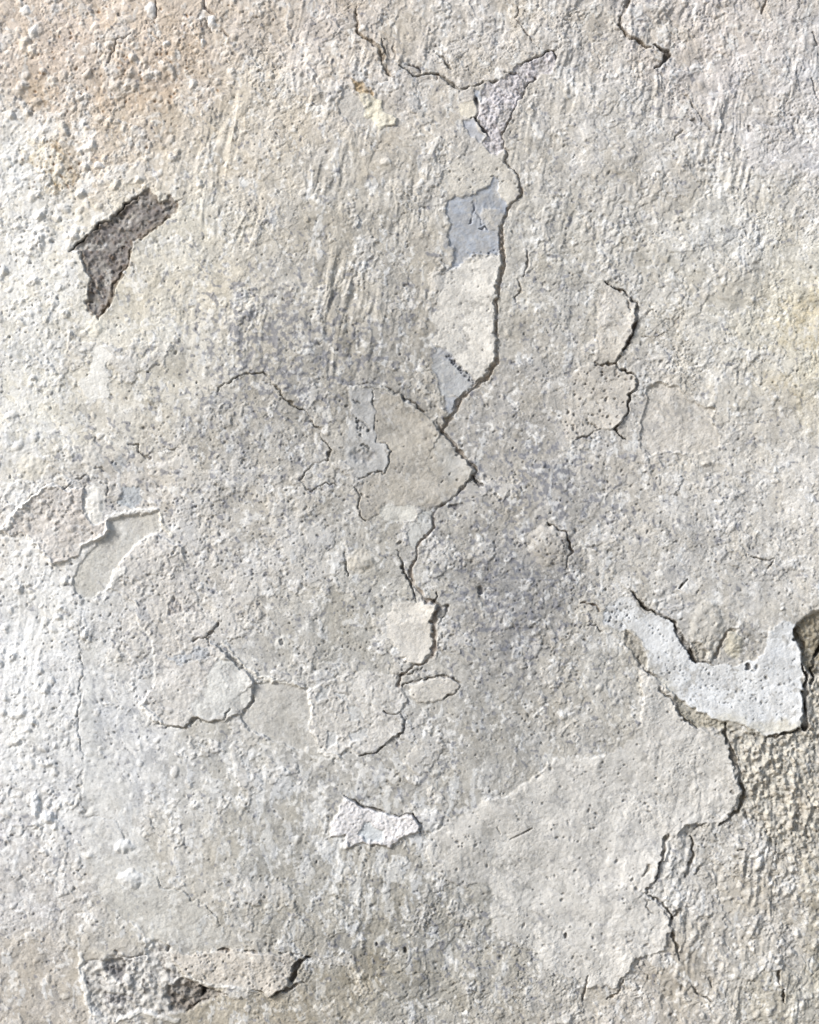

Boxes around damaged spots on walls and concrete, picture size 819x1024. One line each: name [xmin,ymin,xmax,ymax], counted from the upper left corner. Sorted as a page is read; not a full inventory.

crack [618,0,723,139]
spalling [69,188,187,320]
crack [217,372,366,521]
crack [348,6,557,690]
flaking render [432,51,556,415]
crack [575,282,681,441]
flaking render [77,636,298,1024]
flaking render [330,597,819,989]
crack [637,656,747,958]
crack [692,976,713,1004]